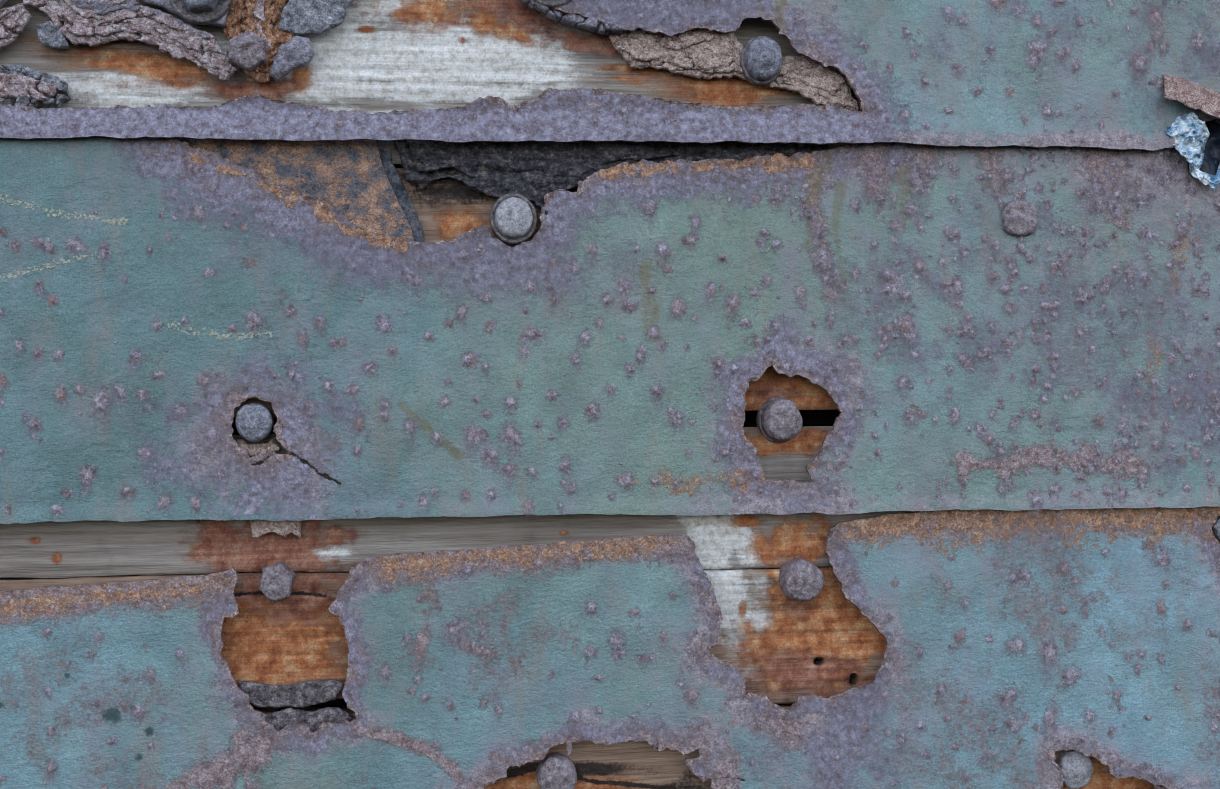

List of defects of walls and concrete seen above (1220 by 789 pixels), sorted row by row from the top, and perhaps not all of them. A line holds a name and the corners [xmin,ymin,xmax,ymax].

peeling [54,71,214,108]
peeling [270,0,592,114]
crack [251,452,341,485]
peeling [314,547,352,556]
corrosion [0,275,1220,789]
peeling [676,514,774,651]